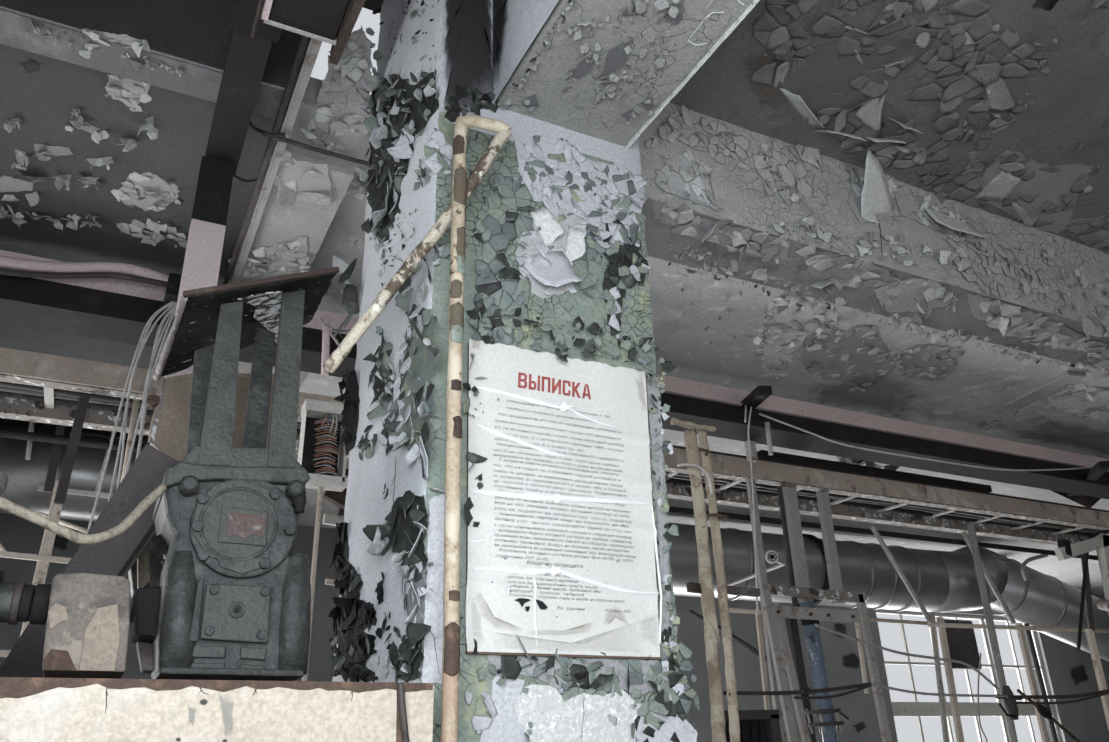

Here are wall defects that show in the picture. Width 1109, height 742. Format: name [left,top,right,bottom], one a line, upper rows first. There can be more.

peeling [0,22,187,248]
crack [688,0,744,48]
peeling [228,237,319,279]
peeling [264,0,1109,742]